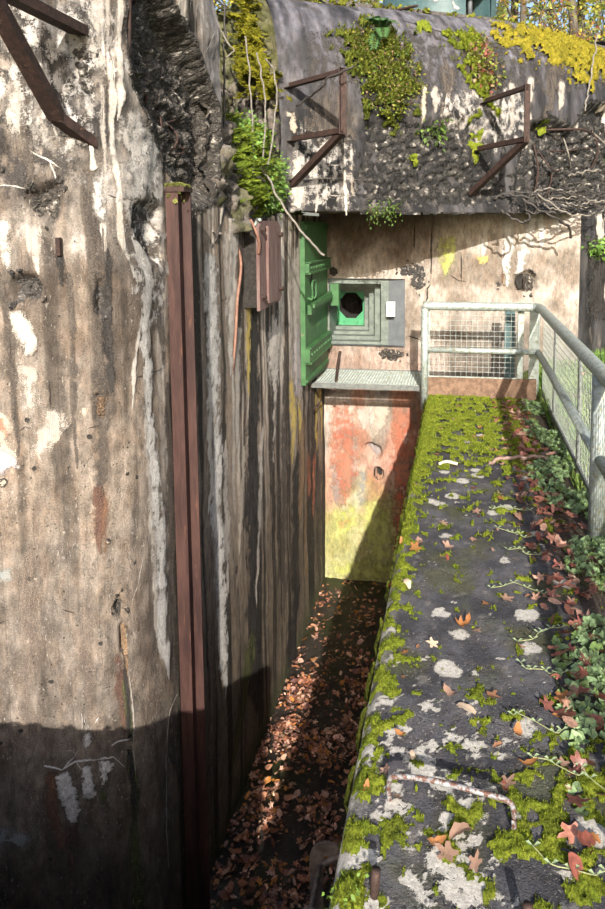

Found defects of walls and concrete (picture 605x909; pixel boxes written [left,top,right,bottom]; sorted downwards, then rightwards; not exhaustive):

spalling [122,0,222,215]
spalling [354,97,605,216]
spalling [23,175,68,231]
spalling [6,268,47,311]
spalling [395,259,430,296]
spalling [496,269,536,298]
leakage [0,0,181,779]
peeling [0,410,20,475]
corrosion [92,486,109,559]
leakage [201,226,418,782]
leakage [44,646,145,909]